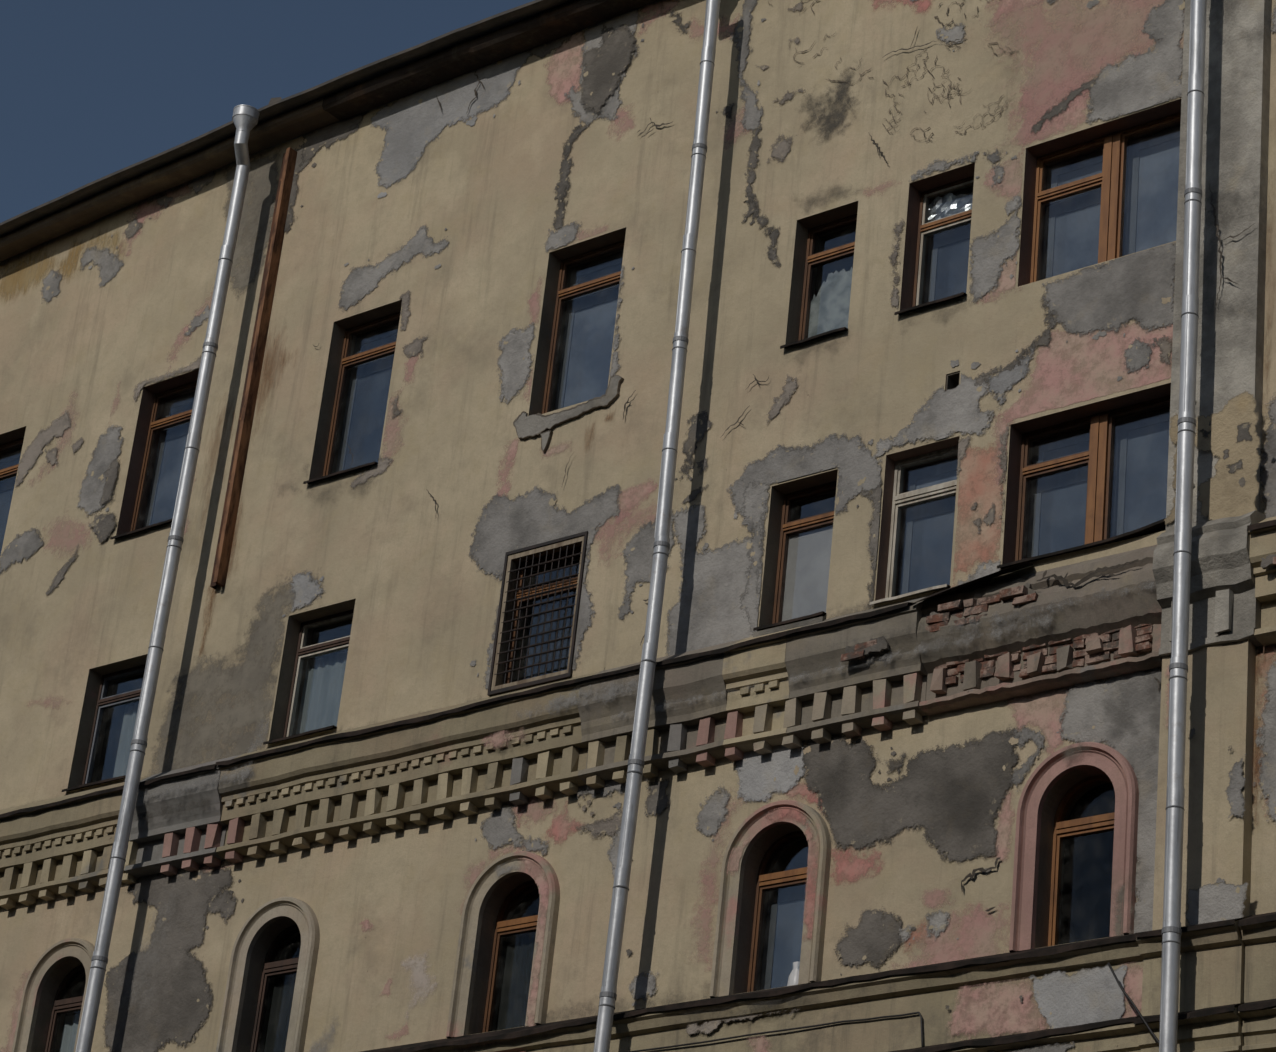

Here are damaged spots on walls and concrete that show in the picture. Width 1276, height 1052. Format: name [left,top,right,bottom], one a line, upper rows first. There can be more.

peeling [284,0,805,267]
crack [768,0,1019,164]
peeling [1031,0,1185,133]
peeling [15,405,123,545]
peeling [469,266,635,689]
peeling [617,242,1178,656]
peeling [104,861,244,1052]
peeling [467,780,626,1027]
peeling [834,904,1009,975]
peeling [695,667,1170,939]
crack [961,857,1001,912]
peeling [945,964,1143,1052]